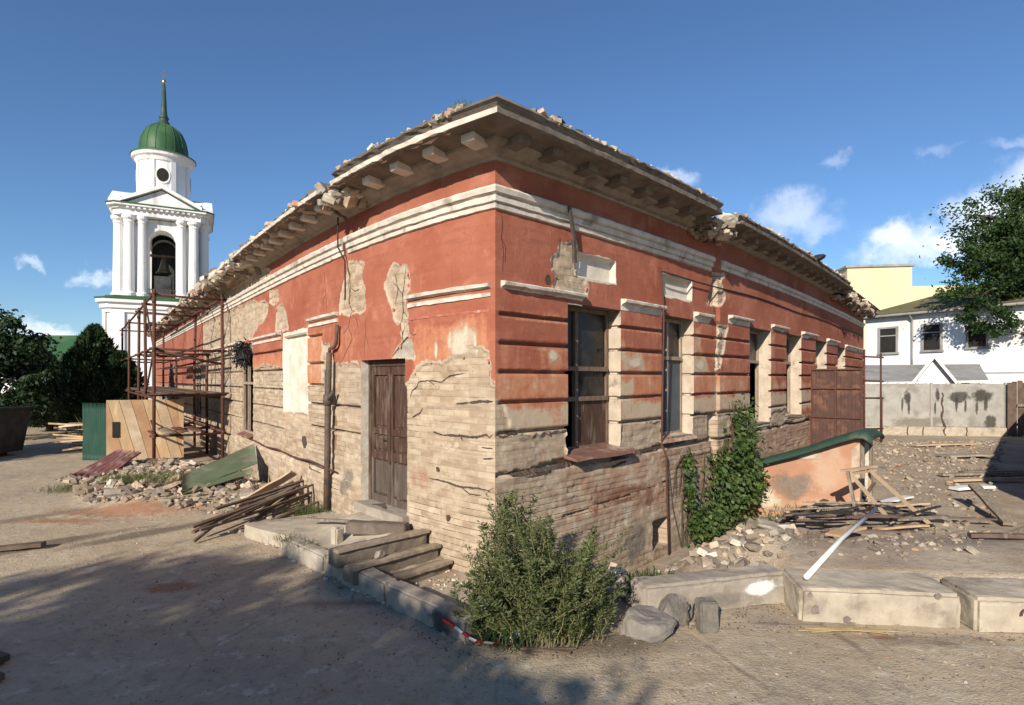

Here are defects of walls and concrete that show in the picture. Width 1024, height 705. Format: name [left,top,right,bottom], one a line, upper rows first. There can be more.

peeling [339,262,365,316]
peeling [545,243,588,293]
flaking render [156,268,362,516]
flaking render [386,264,810,577]
crack [907,392,968,436]
damp [897,389,996,427]